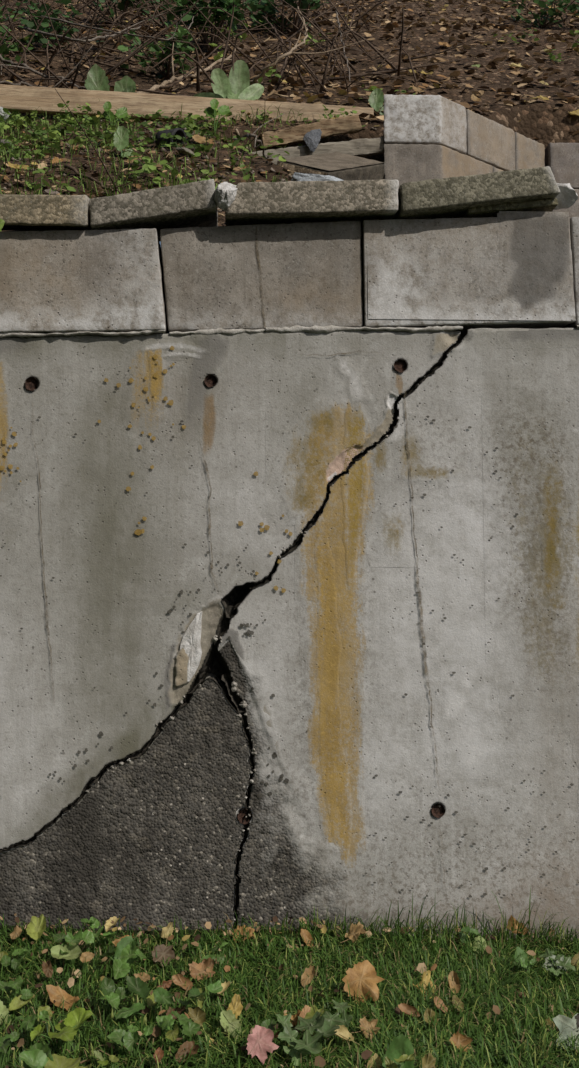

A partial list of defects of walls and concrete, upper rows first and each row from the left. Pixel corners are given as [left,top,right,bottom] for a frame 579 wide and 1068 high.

spalling [0,595,389,935]
crack [0,329,468,929]